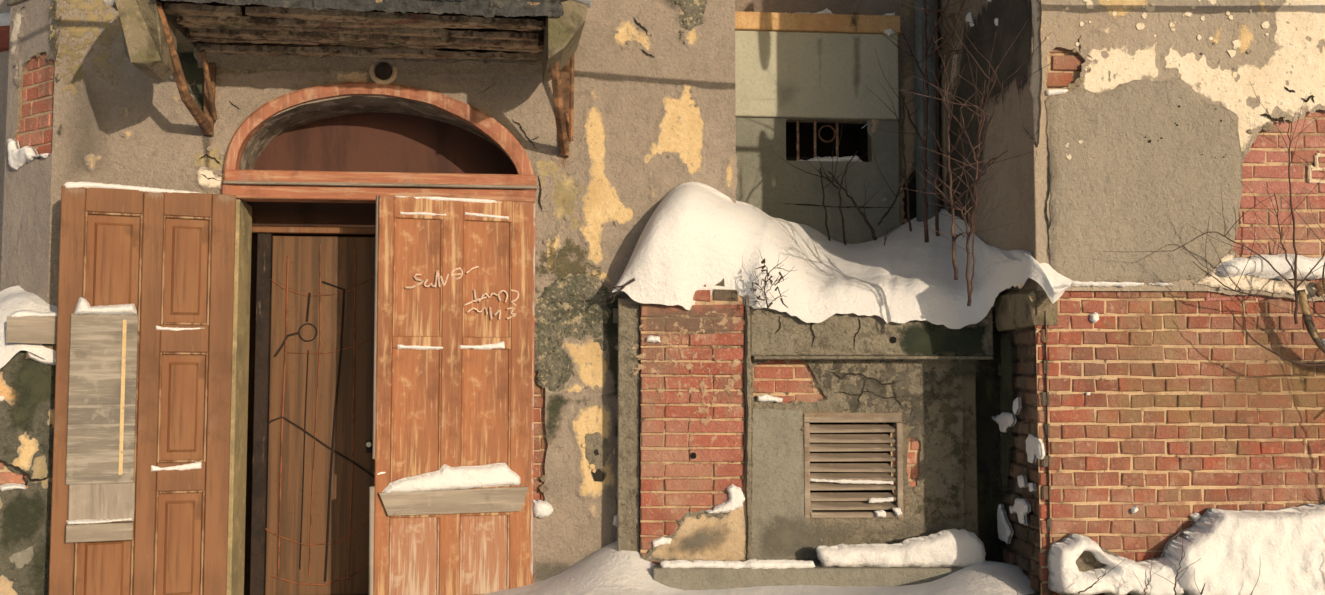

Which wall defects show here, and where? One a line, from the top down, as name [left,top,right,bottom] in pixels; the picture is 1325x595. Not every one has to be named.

spalling [9,8,63,169]
damp [48,3,124,95]
peeling [610,16,656,56]
peeling [639,80,709,179]
spalling [675,0,707,50]
peeling [722,151,737,192]
damp [946,0,1035,225]
spalling [532,103,638,522]
spalling [1029,0,1325,595]
peeling [0,368,16,412]
spalling [751,360,827,405]
peeling [0,404,55,595]